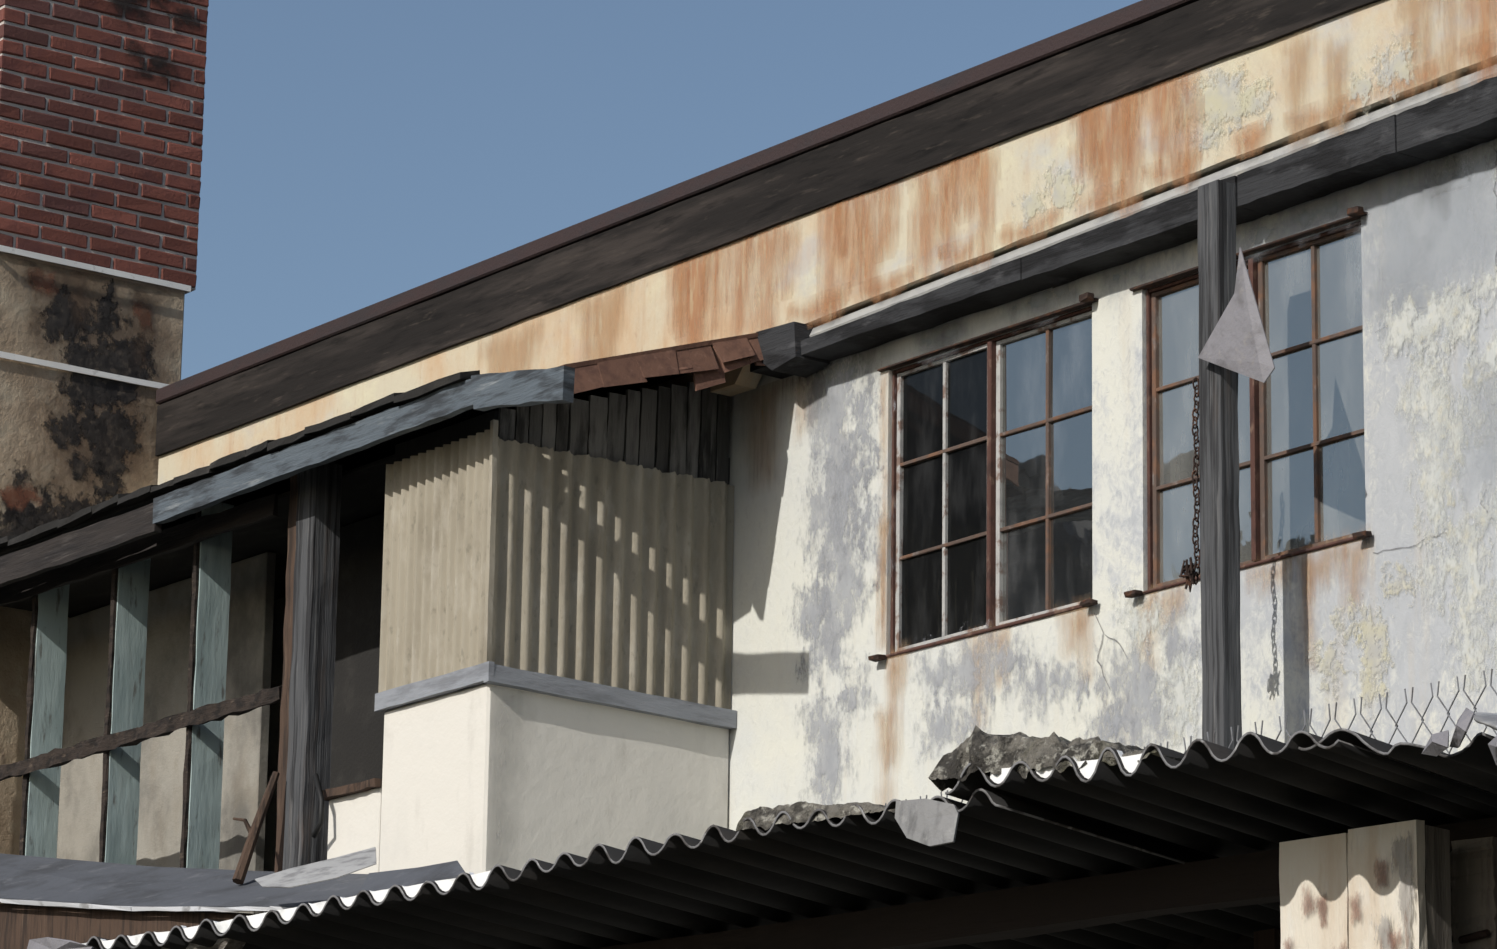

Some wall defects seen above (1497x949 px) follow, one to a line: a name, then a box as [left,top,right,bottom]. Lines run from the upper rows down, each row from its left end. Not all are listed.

leakage [113,0,200,83]
corrosion [1082,95,1136,205]
leakage [51,283,133,352]
corrosion [677,252,718,344]
leakage [0,400,122,538]
crack [1373,491,1493,554]
corrosion [1304,894,1326,926]